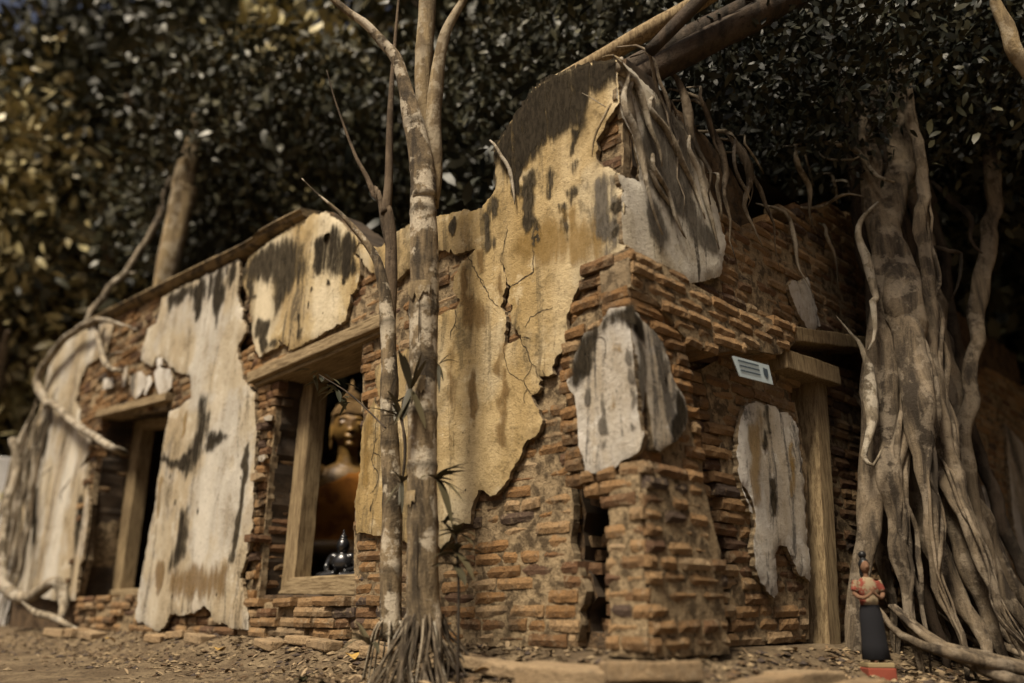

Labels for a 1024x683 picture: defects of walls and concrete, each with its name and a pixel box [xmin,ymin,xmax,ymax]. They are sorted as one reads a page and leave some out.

leakage [167,225,356,352]
crack [467,246,553,403]
leakage [477,58,616,272]
leakage [594,172,623,255]
spalling [695,202,866,336]
leakage [169,505,188,569]
leakage [162,396,226,478]
spalling [69,258,396,641]
leakage [228,443,249,562]
spalling [438,307,809,649]
spalling [822,350,862,642]
spalling [870,560,931,640]